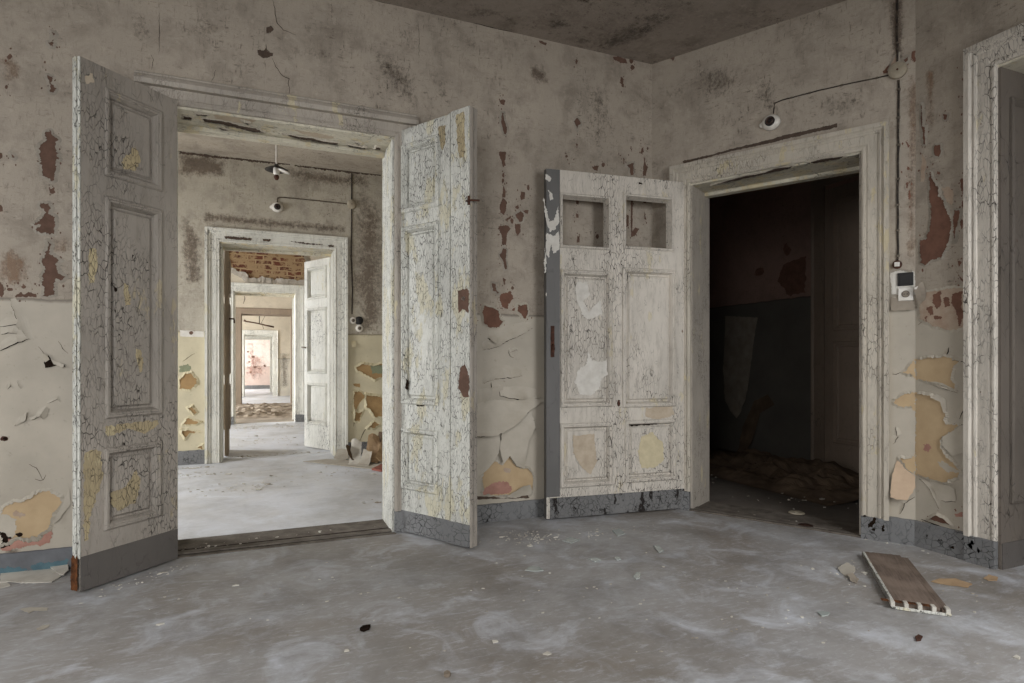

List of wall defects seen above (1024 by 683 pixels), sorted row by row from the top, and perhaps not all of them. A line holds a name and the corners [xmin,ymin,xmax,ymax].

crack [266,2,295,93]
peeling [498,95,509,137]
damp [181,156,223,175]
peeling [0,128,69,311]
peeling [477,151,533,330]
peeling [889,102,963,333]
peeling [42,353,65,368]
peeling [178,364,205,450]
peeling [352,362,382,430]
peeling [891,354,963,485]
peeling [0,488,65,551]
peeling [477,456,535,500]